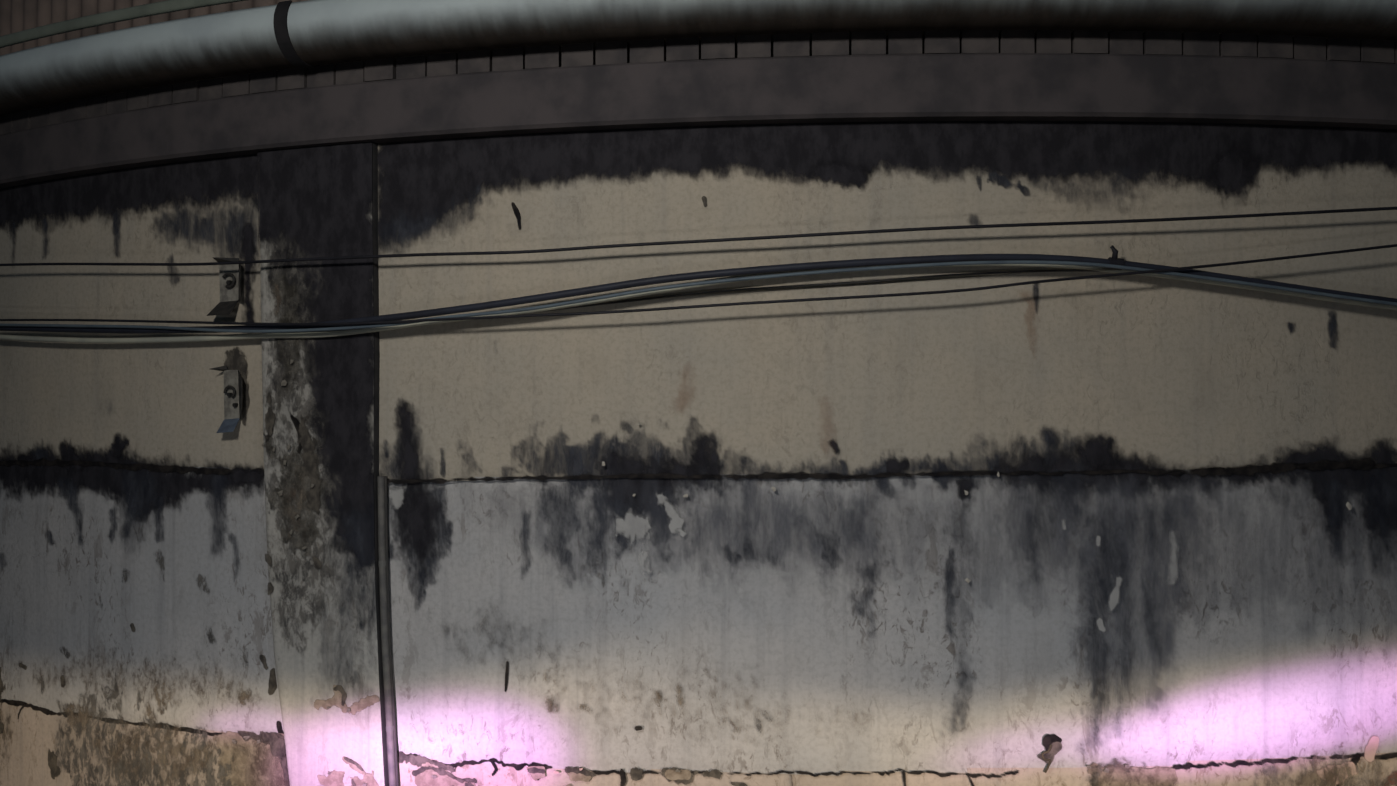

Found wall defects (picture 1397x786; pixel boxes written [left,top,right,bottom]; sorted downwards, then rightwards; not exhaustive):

water stain [0,121,1397,633]
crack [387,457,1397,484]
water stain [791,428,1397,703]
crack [503,661,511,692]
crack [0,667,222,736]
spalling [213,731,289,786]
crack [397,751,552,780]
crack [591,769,1019,786]
spalling [1086,758,1178,786]
crack [1173,753,1397,786]
peeling [1316,736,1379,784]